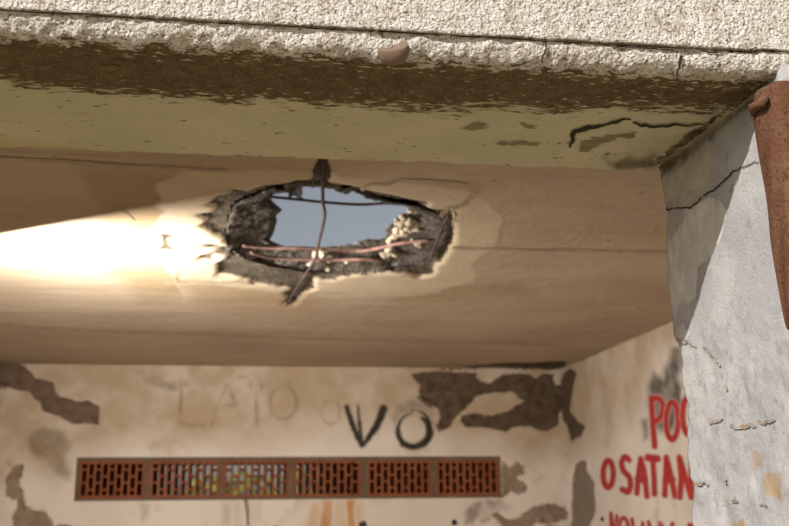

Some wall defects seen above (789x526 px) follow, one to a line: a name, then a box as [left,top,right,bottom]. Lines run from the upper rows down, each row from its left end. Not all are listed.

crack [568,101,740,170]
crack [666,161,759,211]
spalling [191,159,454,305]
spalling [0,364,100,426]
spalling [411,360,585,445]
spalling [4,461,73,526]
corrosion [302,499,367,526]
spalling [491,459,596,526]